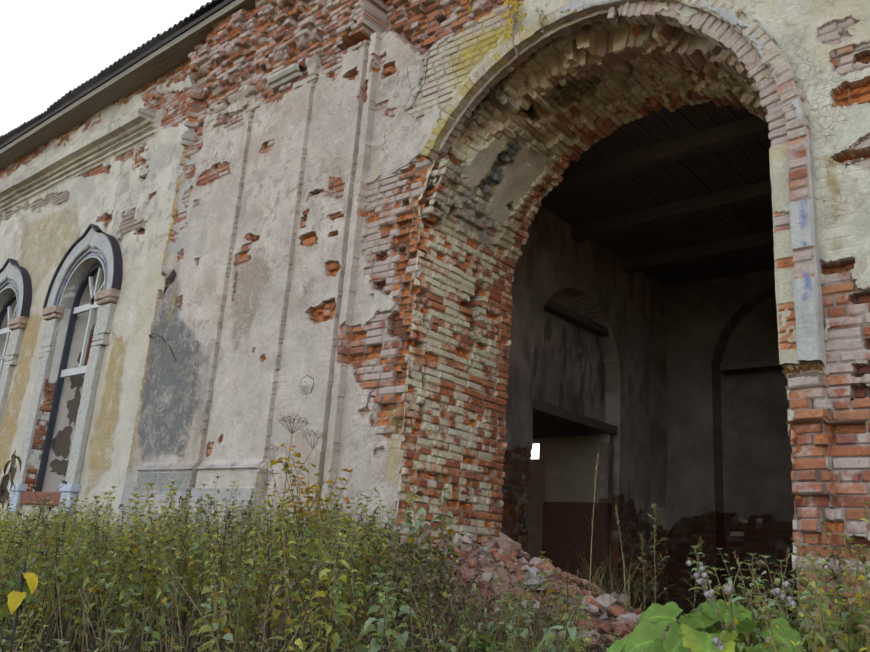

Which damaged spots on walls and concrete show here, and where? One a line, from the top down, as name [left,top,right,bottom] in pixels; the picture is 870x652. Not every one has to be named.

spalling [0,0,524,312]
spalling [522,103,542,127]
spalling [814,11,870,109]
spalling [829,130,870,173]
flaking render [298,150,444,458]
flaking render [24,323,96,492]
flaking render [775,254,870,638]